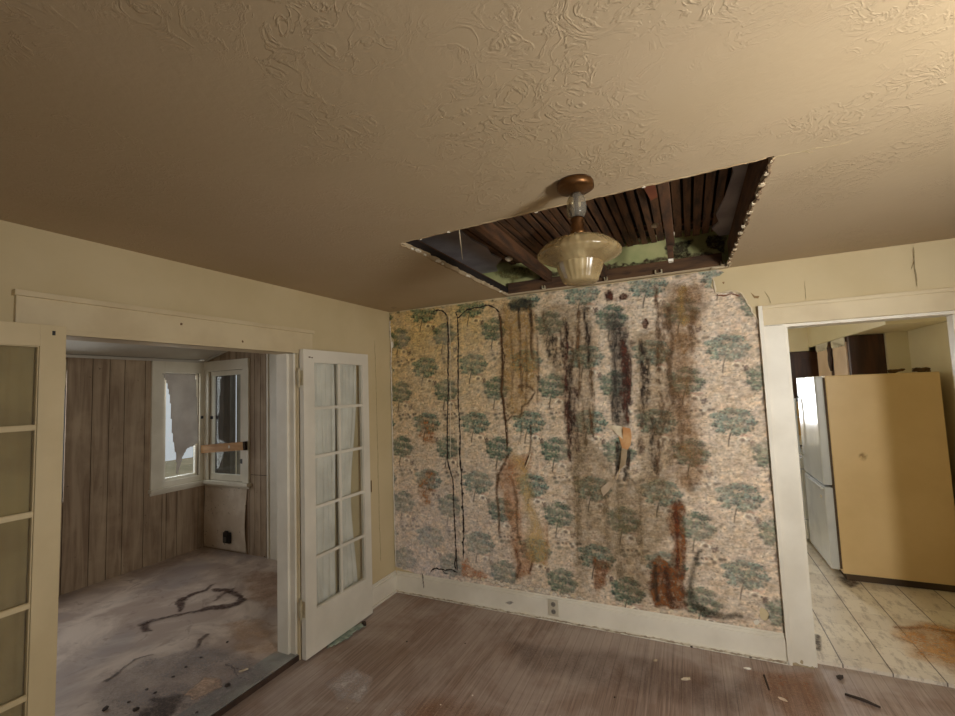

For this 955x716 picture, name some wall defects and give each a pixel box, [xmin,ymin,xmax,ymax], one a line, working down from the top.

flaking render [401,157,776,296]
damp [496,299,536,526]
damp [549,307,594,461]
damp [605,287,702,489]
damp [689,582,742,618]